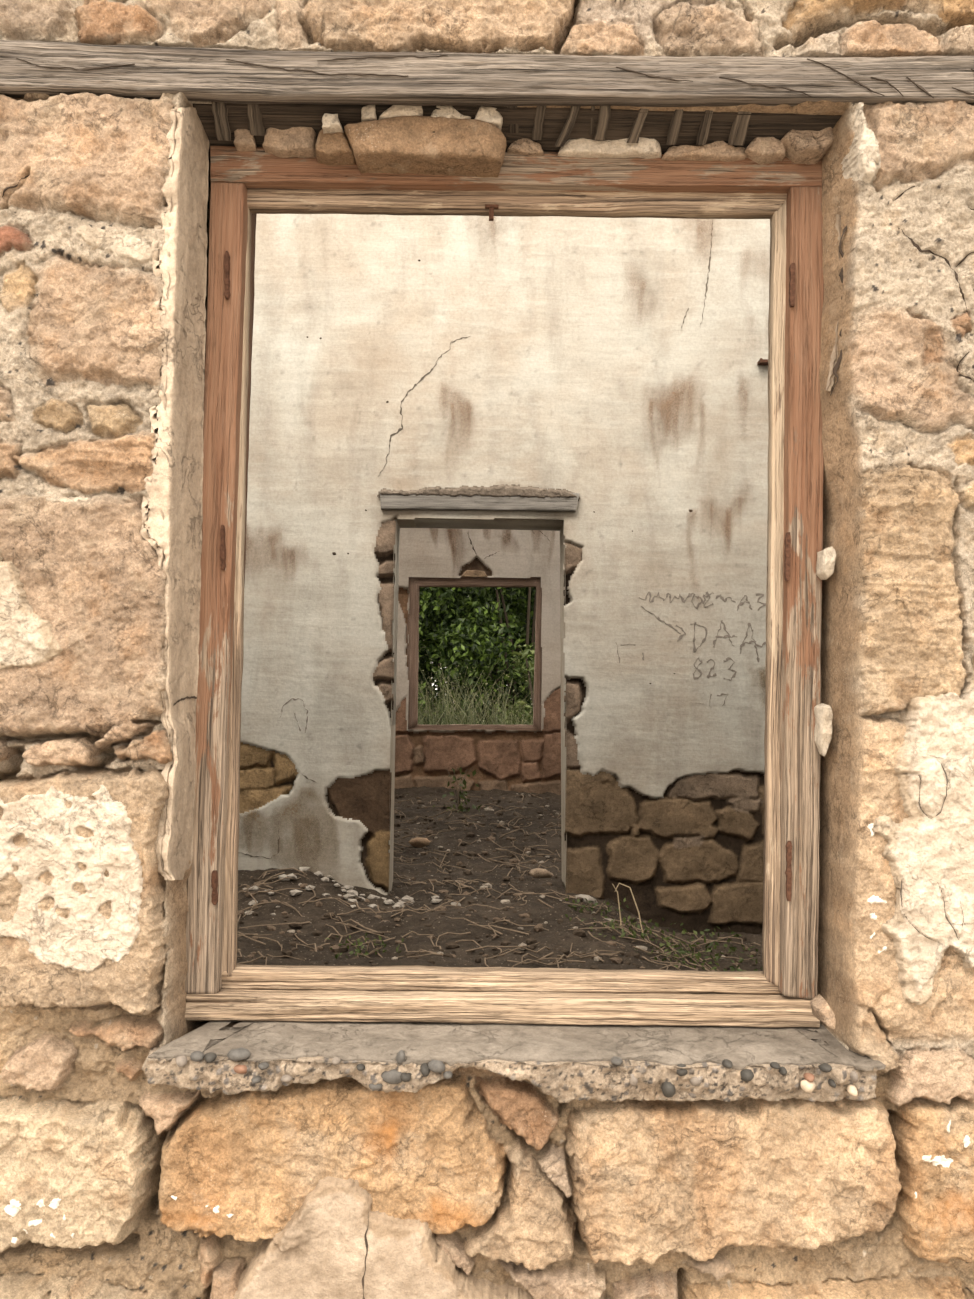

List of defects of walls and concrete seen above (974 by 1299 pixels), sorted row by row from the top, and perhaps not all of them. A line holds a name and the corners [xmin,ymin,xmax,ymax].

crack [895,186,974,316]
crack [380,336,470,473]
flaking render [240,742,299,813]
peeling [909,757,947,818]
peeling [867,889,939,953]